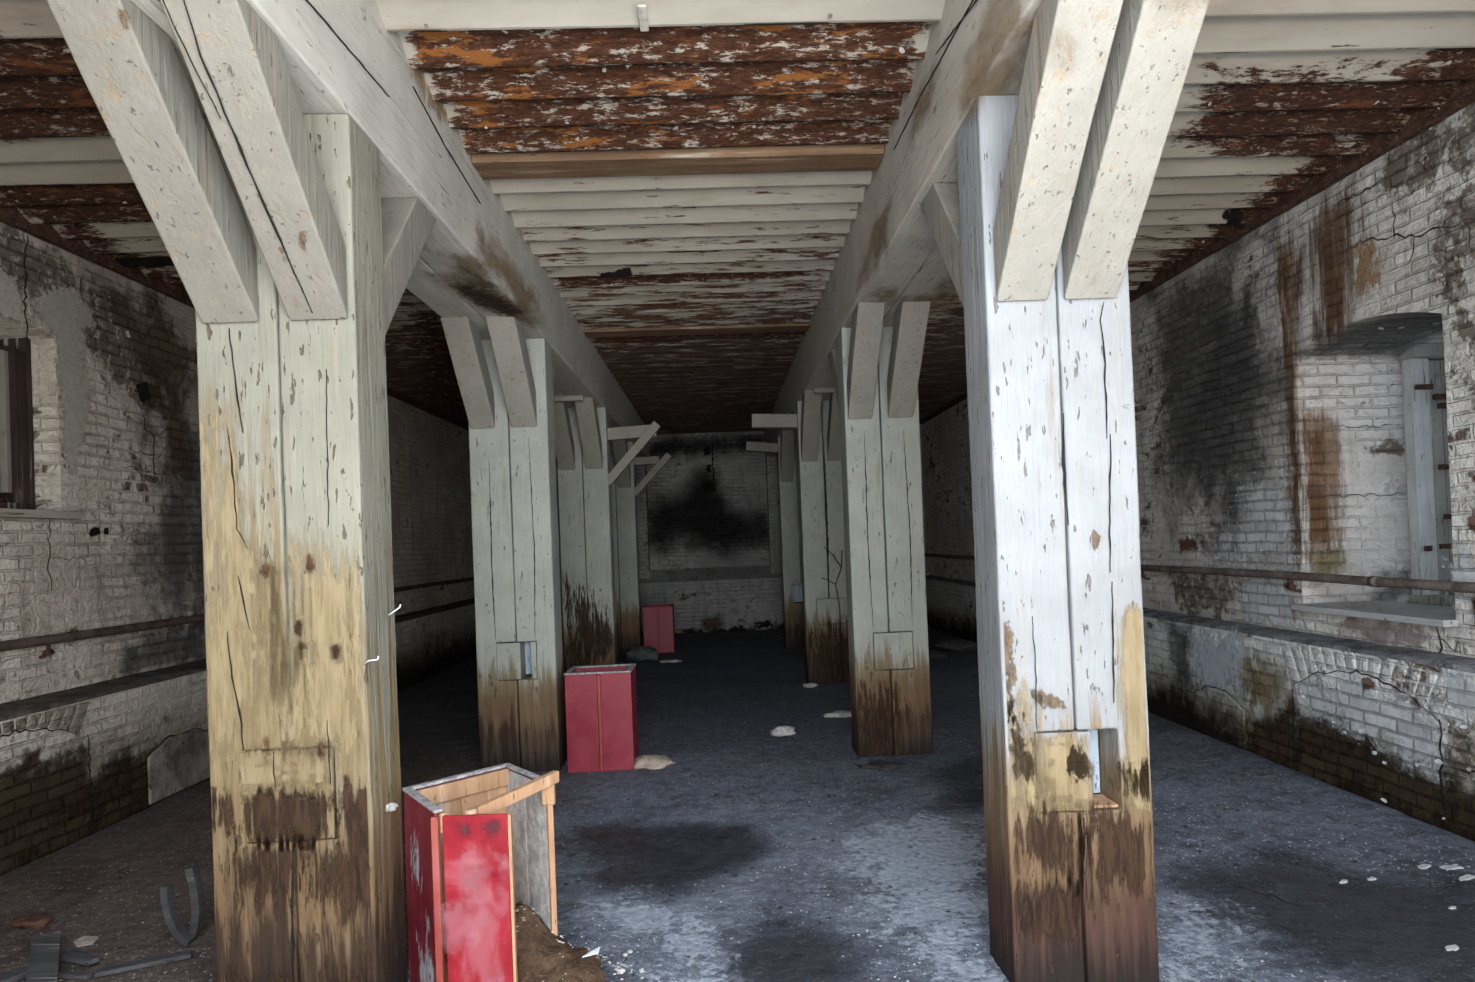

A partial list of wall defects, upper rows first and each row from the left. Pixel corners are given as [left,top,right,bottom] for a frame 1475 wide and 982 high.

crack [158,0,313,314]
peeling [1222,208,1244,225]
corrosion [1144,48,1475,279]
peeling [1380,102,1475,391]
damp [81,287,205,675]
damp [1147,221,1475,838]
corrosion [1278,186,1381,565]
damp [0,744,153,876]
damp [579,825,761,892]
damp [733,919,857,982]
damp [1013,759,1154,944]
damp [1178,848,1475,982]